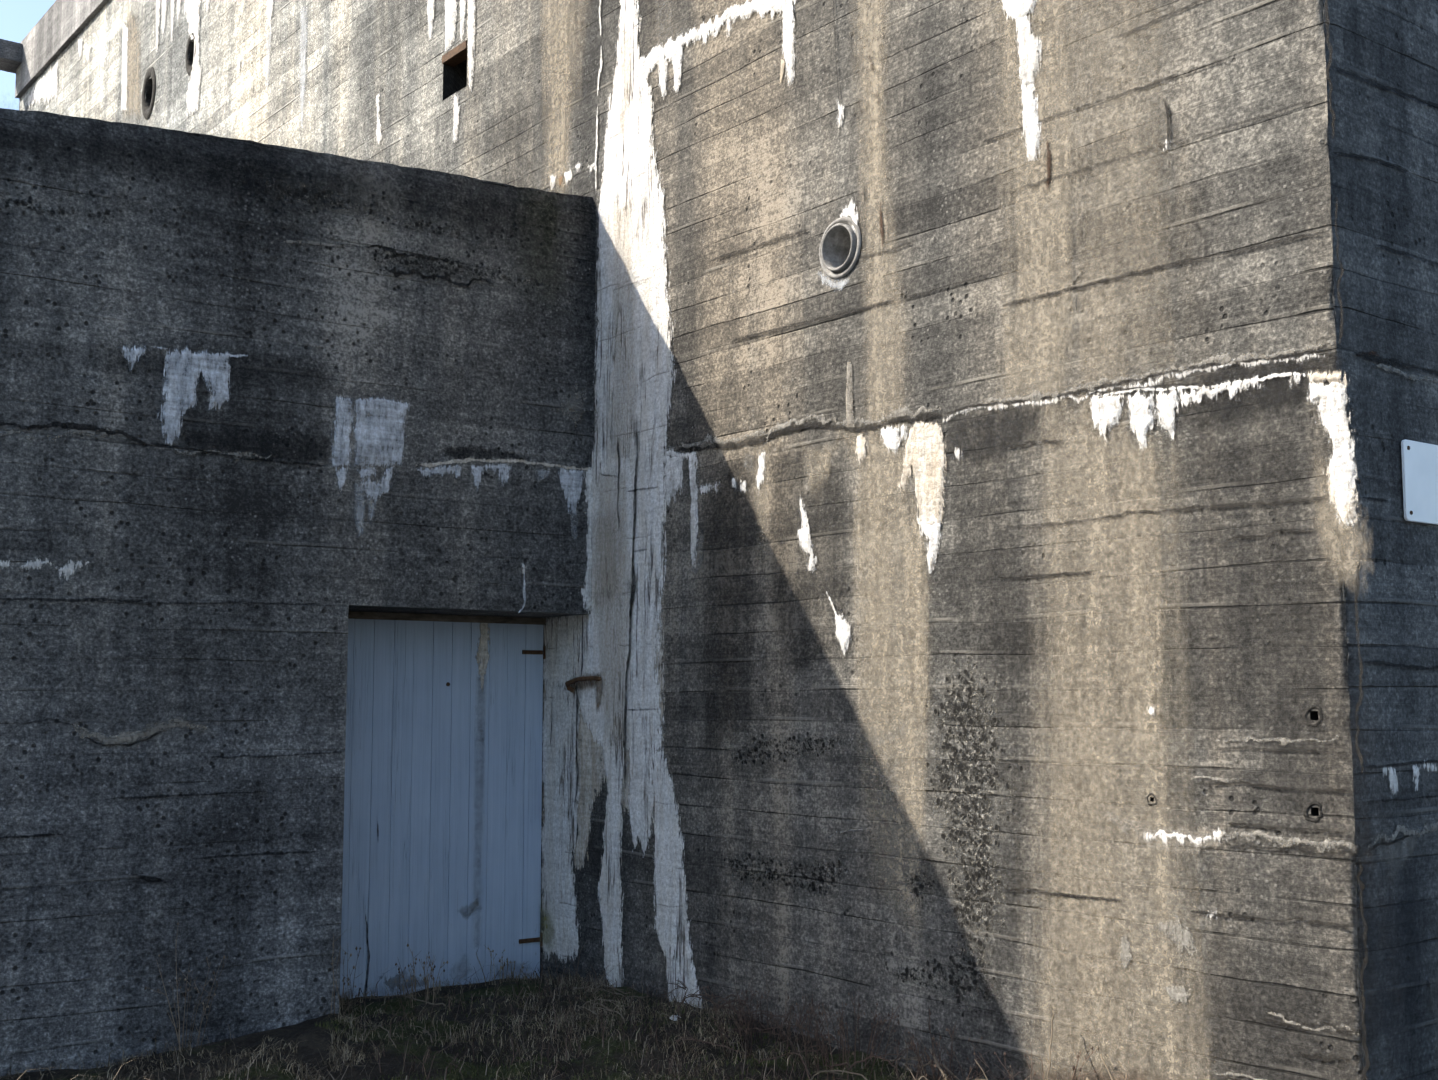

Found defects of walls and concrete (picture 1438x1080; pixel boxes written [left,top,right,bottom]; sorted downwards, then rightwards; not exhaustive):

leakage [200,0,572,227]
crack [859,185,911,259]
crack [0,421,324,466]
leakage [541,0,702,1008]
leakage [756,451,791,520]
leakage [850,0,926,931]
crack [603,201,1438,793]
leakage [1203,360,1366,578]
leakage [1043,427,1195,1080]
crack [1003,888,1120,901]
crack [1109,816,1438,1080]